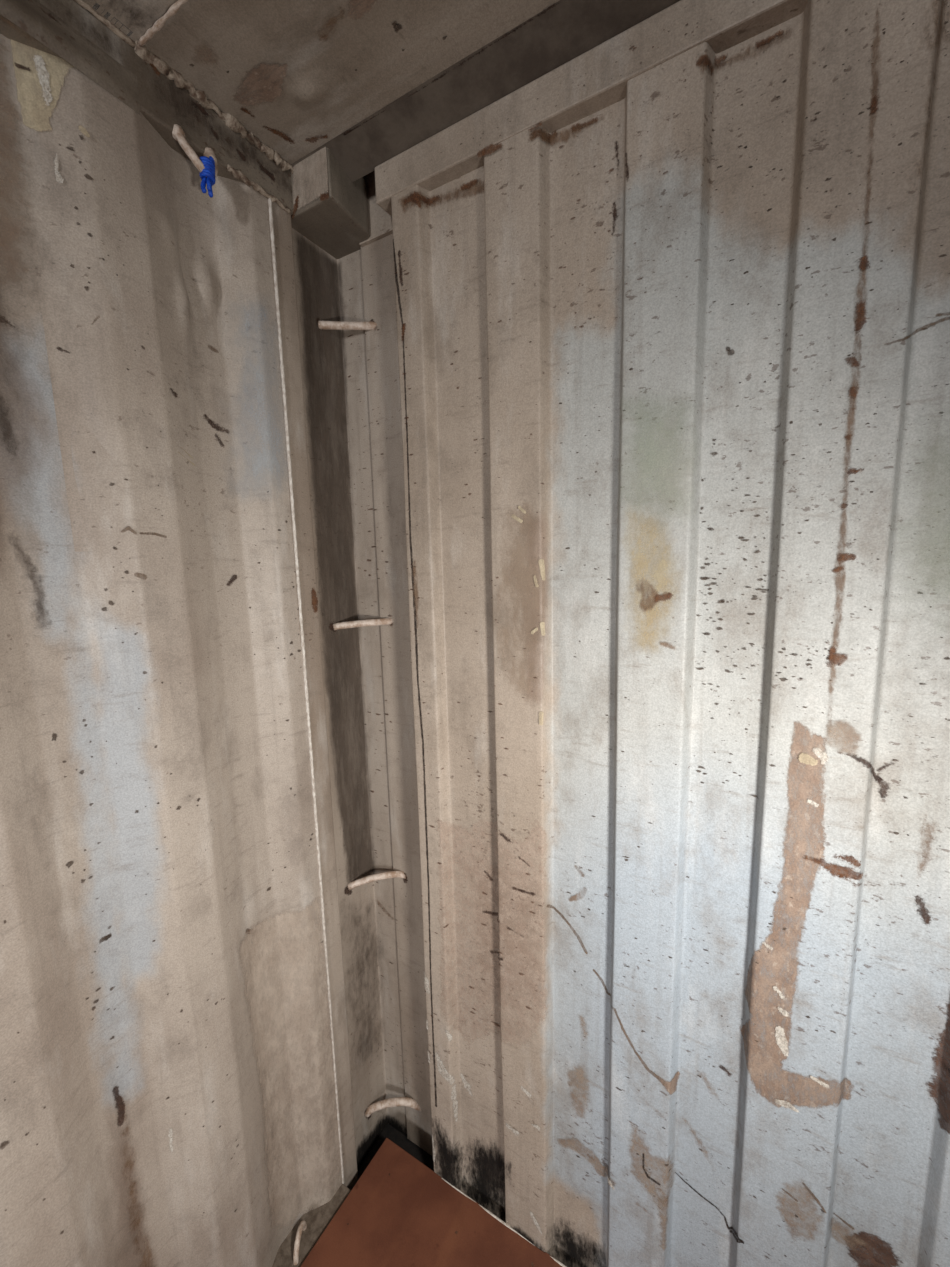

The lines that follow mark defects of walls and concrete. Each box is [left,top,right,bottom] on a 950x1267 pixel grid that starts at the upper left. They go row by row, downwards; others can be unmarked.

rust [402,179,484,209]
rust [460,127,502,157]
rust [685,31,787,187]
rust [824,18,914,135]
rust [696,229,907,799]
peeling [741,722,852,1112]
peeling [926,1004,950,1133]
damp [356,1116,407,1171]
damp [433,1123,510,1216]
damp [512,1225,606,1267]
peeling [630,1130,673,1249]